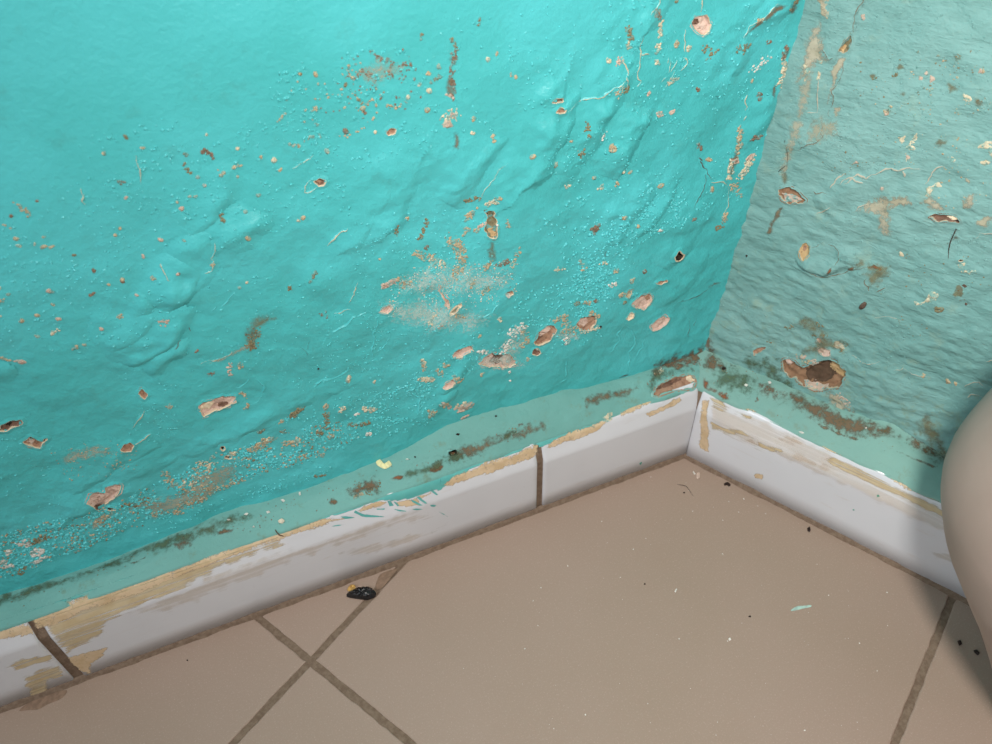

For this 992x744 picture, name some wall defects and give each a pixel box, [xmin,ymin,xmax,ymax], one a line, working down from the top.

flaking render [688,11,715,39]
crack [798,0,865,151]
flaking render [449,322,559,382]
flaking render [780,335,849,393]
flaking render [195,393,240,419]
leakage [441,402,475,420]
leakage [586,389,630,405]
leakage [646,397,681,417]
flaking render [651,372,699,399]
flaking render [83,481,125,512]
leakage [317,490,446,527]
leakage [0,539,48,565]